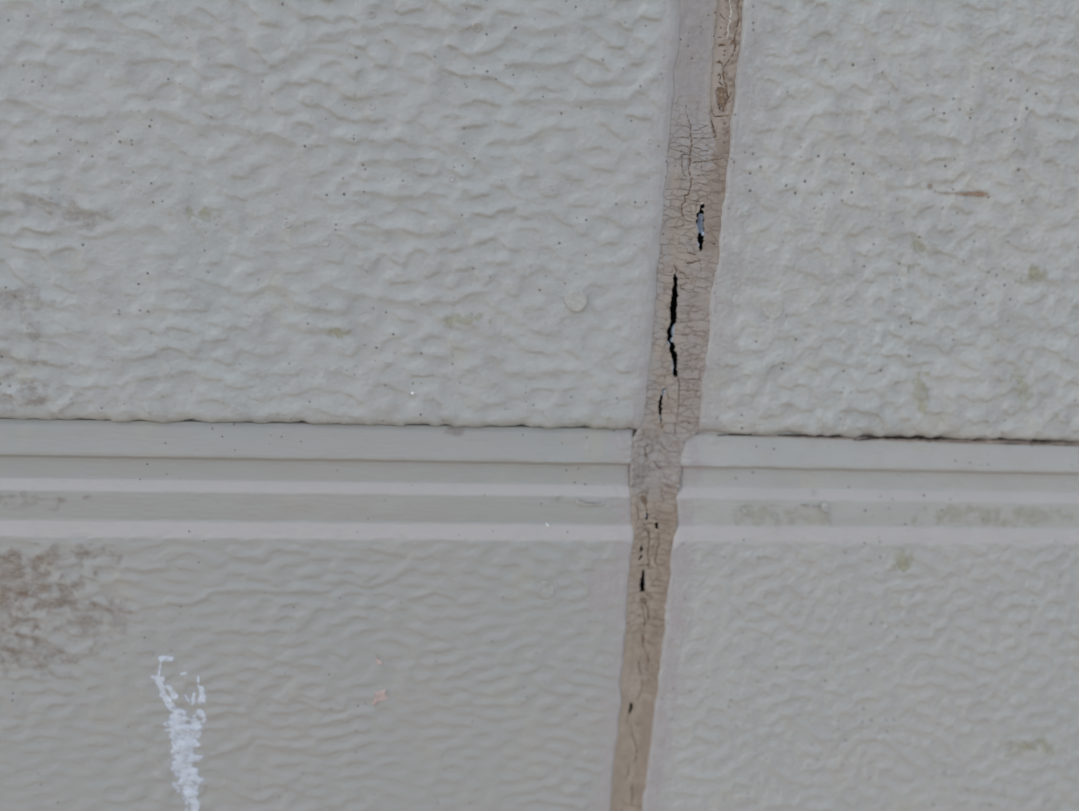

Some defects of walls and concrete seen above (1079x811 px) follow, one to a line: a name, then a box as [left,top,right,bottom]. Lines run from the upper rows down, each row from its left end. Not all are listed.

water stain [163,672,207,811]
crack [621,0,740,811]